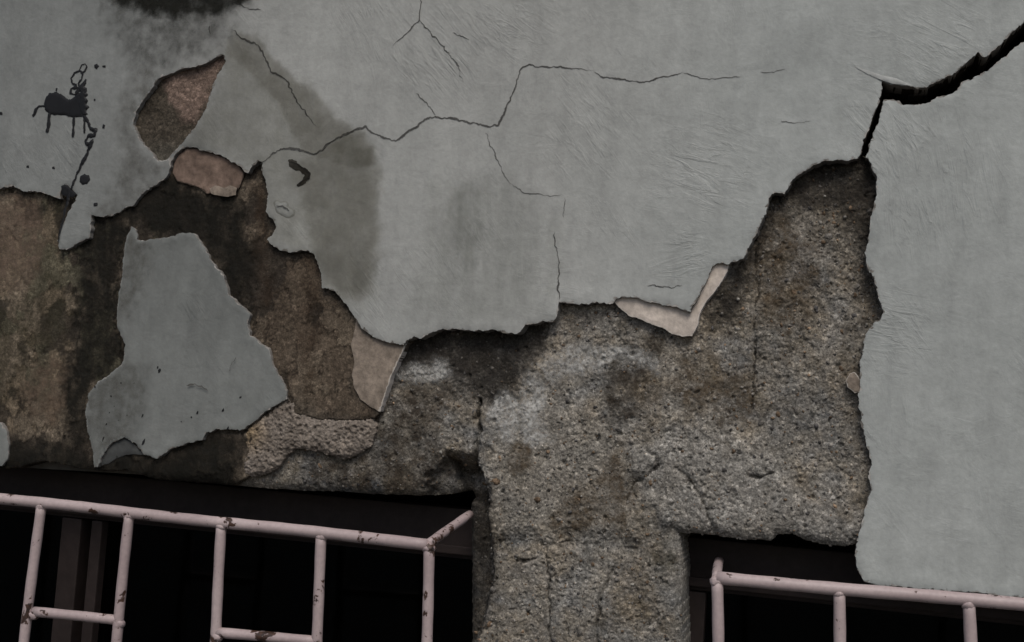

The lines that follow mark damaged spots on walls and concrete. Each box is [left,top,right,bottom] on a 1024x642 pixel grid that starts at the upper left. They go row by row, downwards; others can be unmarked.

crack [208,0,737,299]
crack [855,24,1024,158]
spalling [0,57,883,642]